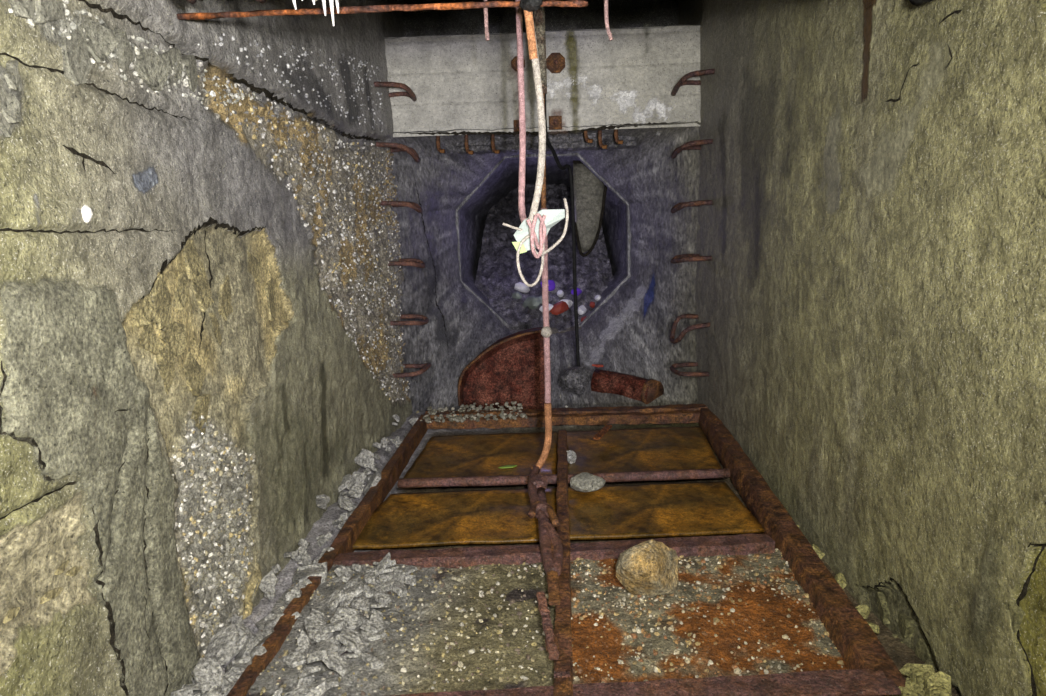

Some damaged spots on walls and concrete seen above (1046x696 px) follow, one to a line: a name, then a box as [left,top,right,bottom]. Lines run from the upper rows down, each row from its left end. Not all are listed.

spalling [176,0,520,20]
corrosion [861,0,876,102]
crack [0,227,176,235]
crack [0,408,169,696]